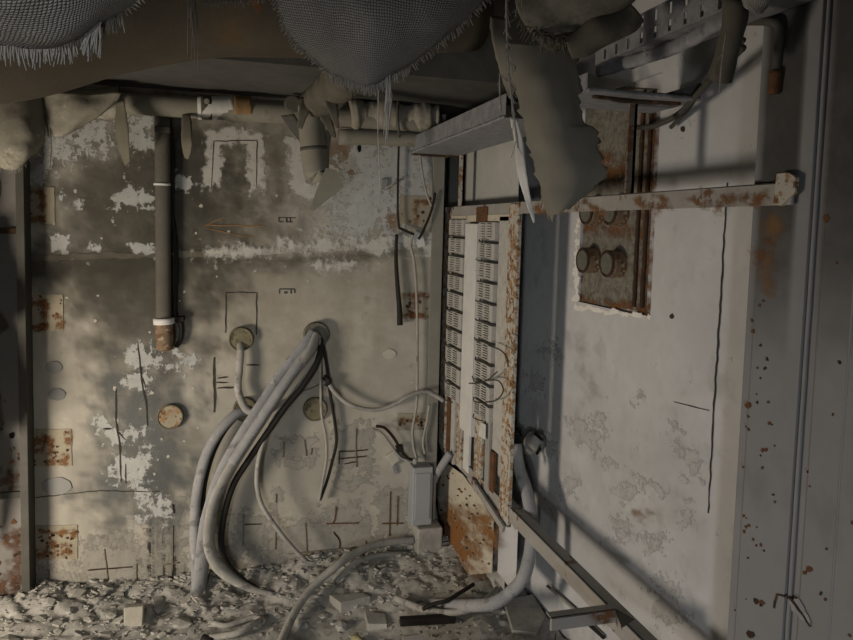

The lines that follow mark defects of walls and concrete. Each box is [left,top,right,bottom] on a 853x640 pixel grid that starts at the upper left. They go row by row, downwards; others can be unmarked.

rust [592,95,681,106]
peeling [30,118,117,187]
peeling [106,114,155,226]
peeling [170,167,203,207]
damp [55,135,175,365]
damp [170,126,432,328]
rust [580,295,651,316]
peeling [113,331,202,395]
rust [0,519,22,596]
spalling [36,409,190,585]
rust [436,464,498,575]
rust [745,594,811,627]